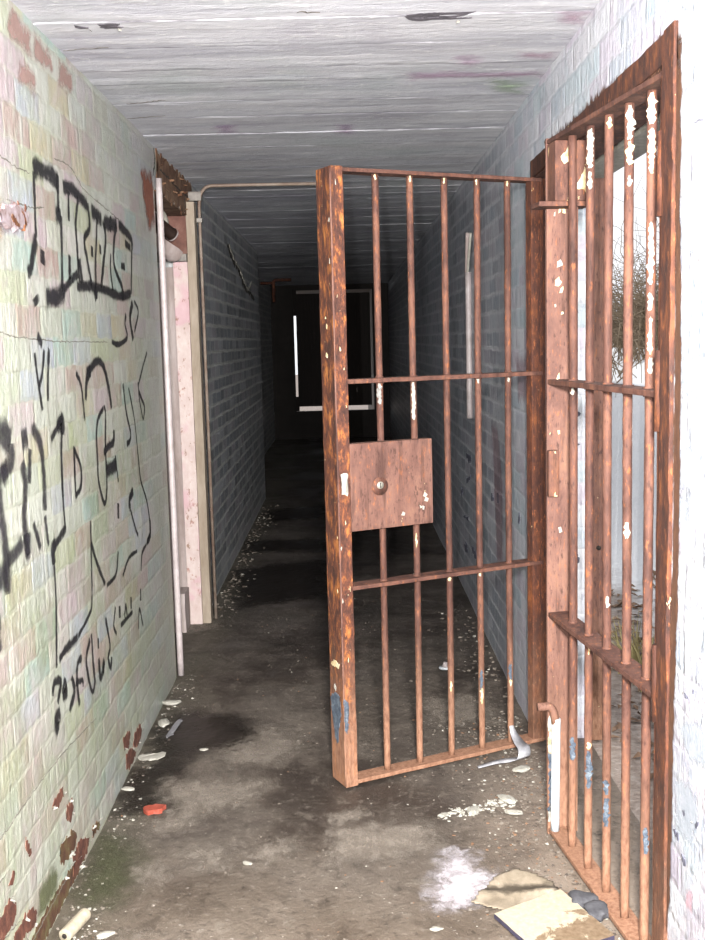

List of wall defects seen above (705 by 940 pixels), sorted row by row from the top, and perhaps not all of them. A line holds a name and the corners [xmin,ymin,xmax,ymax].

spalling [404,11,476,23]
peeling [577,128,595,192]
peeling [625,92,658,187]
corrosion [666,36,682,928]
peeling [123,724,143,770]
water stain [117,711,257,814]
peeling [0,787,103,940]
flaking render [96,931,115,940]